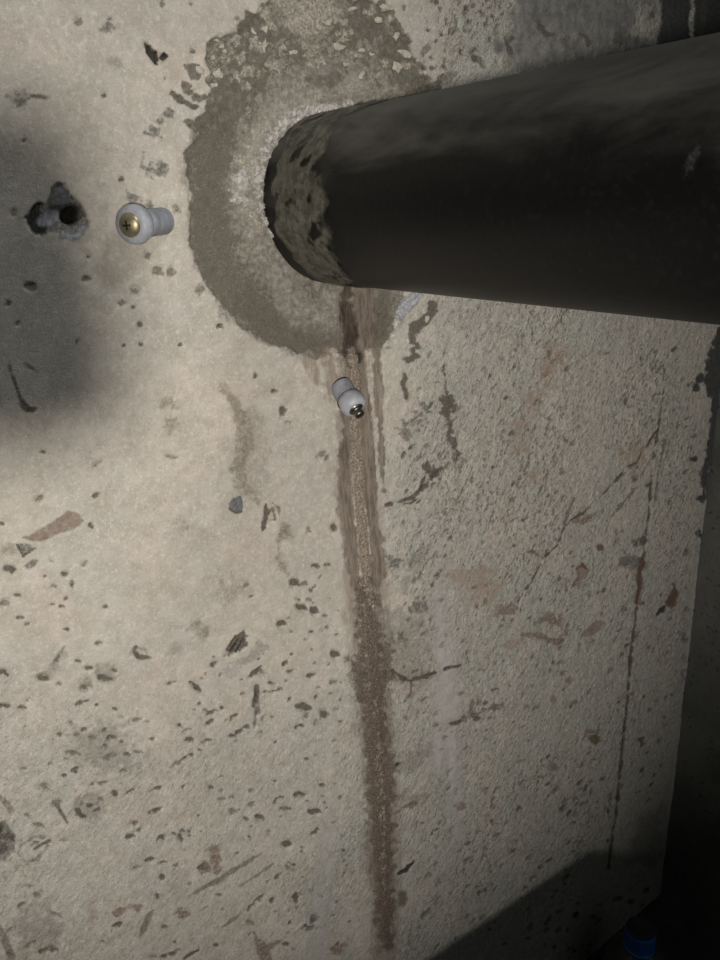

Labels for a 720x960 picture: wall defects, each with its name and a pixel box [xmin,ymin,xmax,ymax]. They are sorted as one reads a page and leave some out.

spalling [11,182,76,235]
damp [187,113,422,353]
crack [517,428,659,603]
crack [391,664,461,703]